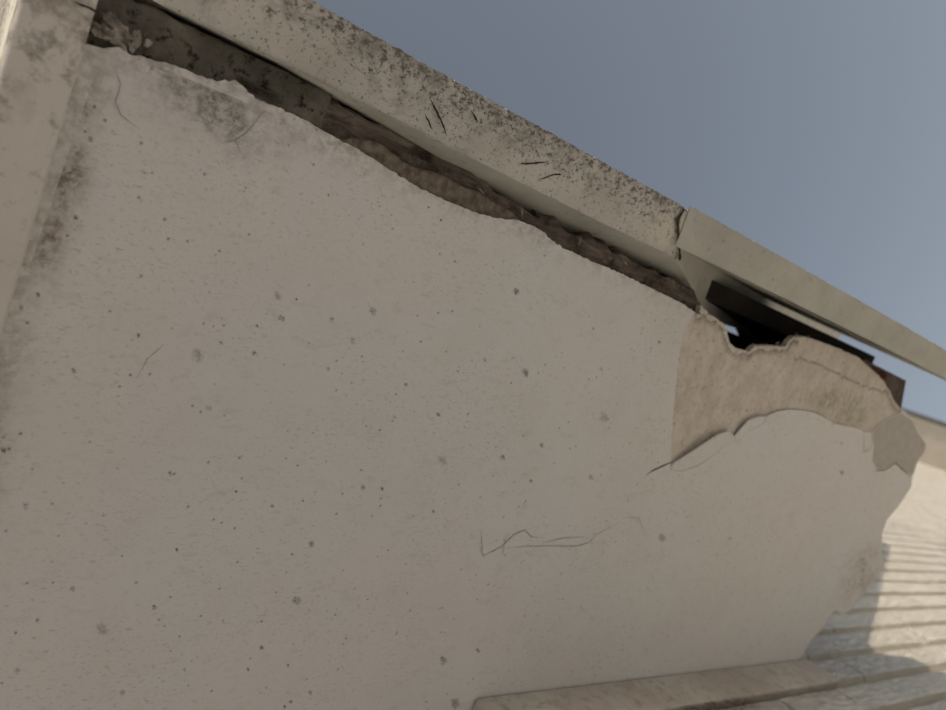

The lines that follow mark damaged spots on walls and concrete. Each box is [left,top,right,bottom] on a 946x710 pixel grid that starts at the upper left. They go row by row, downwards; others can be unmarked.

peeling [671,306,926,475]
crack [480,517,645,555]